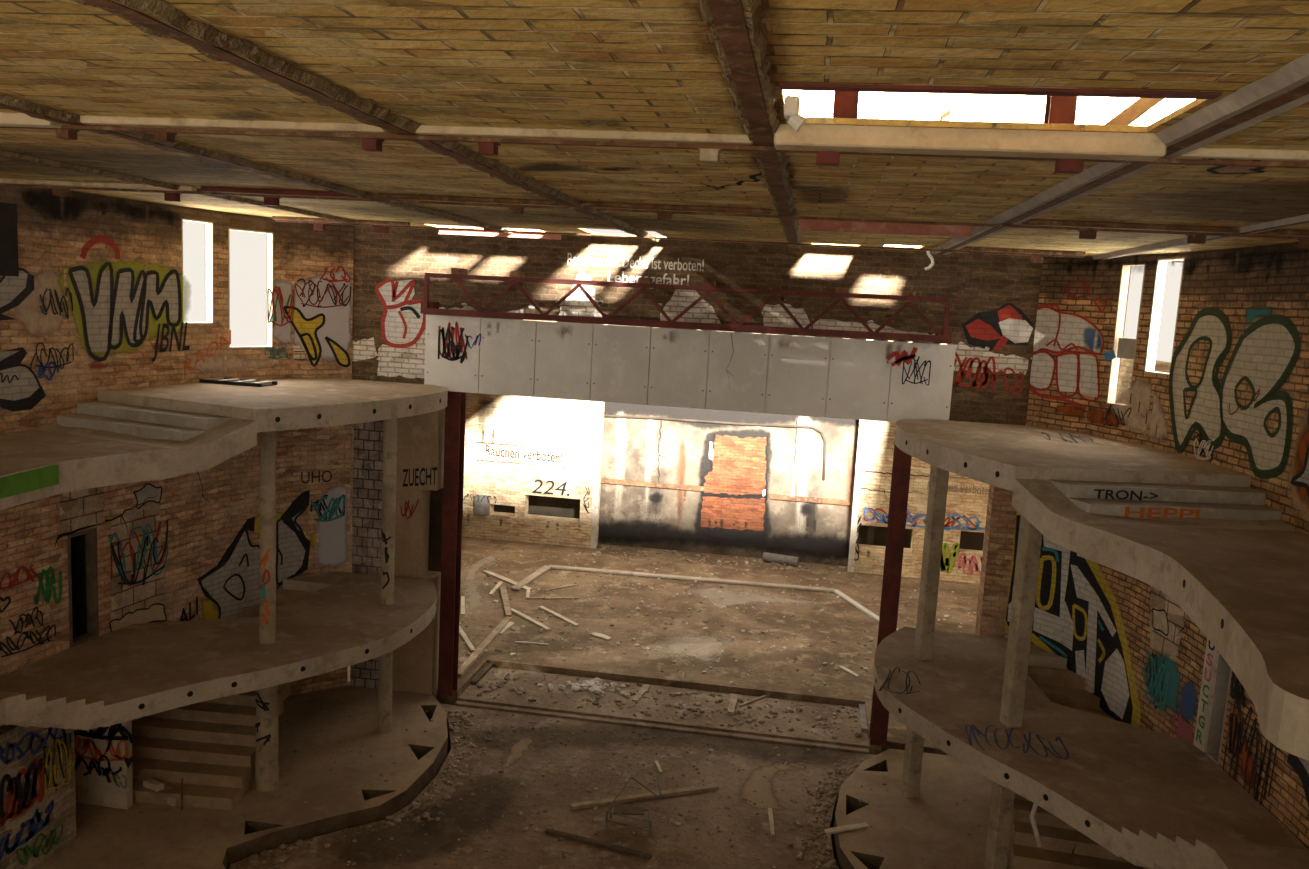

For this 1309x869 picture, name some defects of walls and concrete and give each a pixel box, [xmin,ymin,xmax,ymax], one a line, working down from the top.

water stain [24,190,181,225]
water stain [479,401,495,443]
water stain [598,402,860,559]